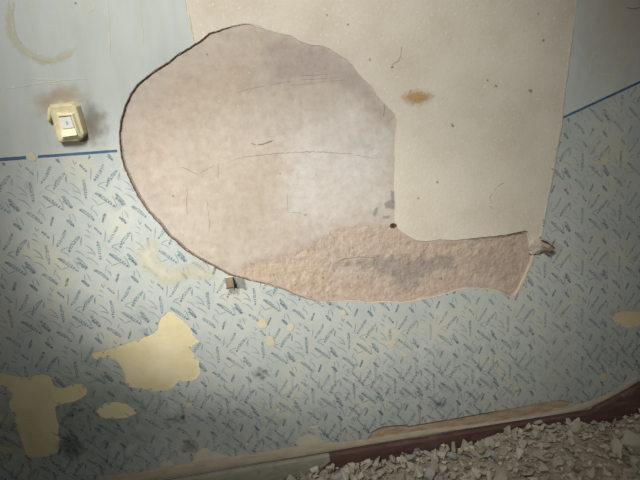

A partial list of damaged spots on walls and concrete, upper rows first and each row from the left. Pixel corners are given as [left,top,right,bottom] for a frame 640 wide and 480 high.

spalling [119,0,577,303]
peeling [91,312,200,391]
peeling [0,373,87,458]
peeling [96,402,136,419]
spalling [368,400,571,439]